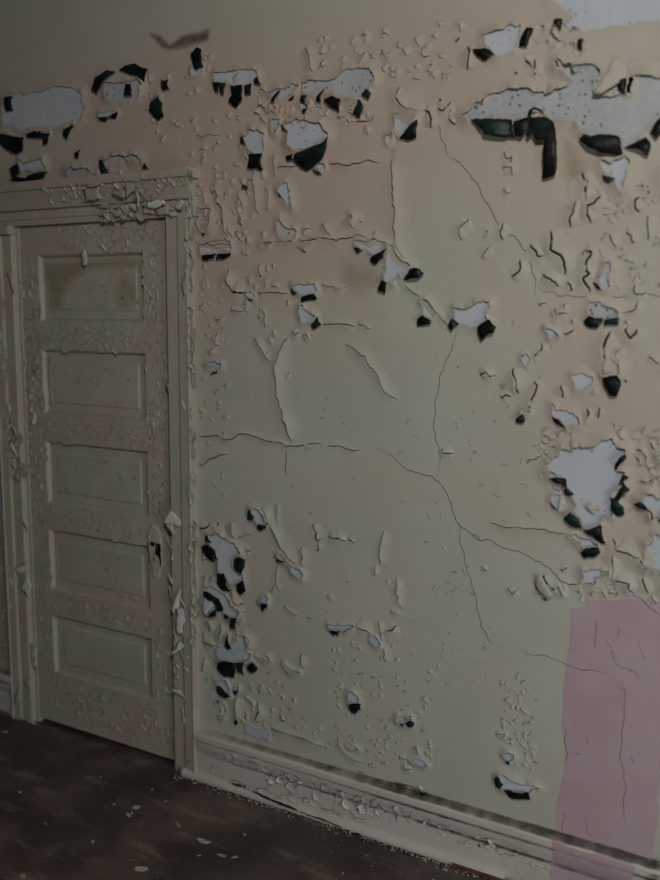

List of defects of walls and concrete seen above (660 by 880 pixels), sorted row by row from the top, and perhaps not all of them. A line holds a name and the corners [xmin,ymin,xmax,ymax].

crack [298,43,321,74]
peeling [0,0,660,295]
peeling [286,275,324,343]
crack [189,82,660,646]
peeling [414,288,502,342]
peeling [577,252,628,331]
peeling [514,346,660,605]
peeling [198,524,305,744]
crack [216,687,364,769]
crack [198,499,408,674]
peeling [490,671,548,803]
crack [521,622,646,821]